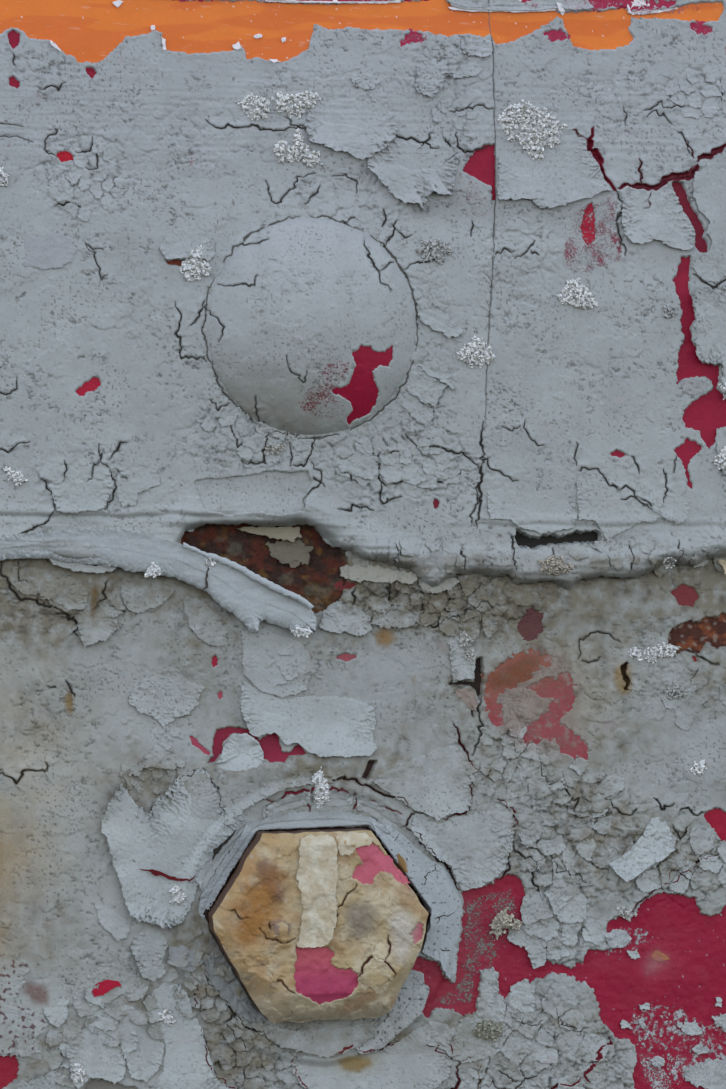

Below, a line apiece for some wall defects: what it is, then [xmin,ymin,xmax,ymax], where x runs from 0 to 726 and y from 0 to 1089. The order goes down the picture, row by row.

crack [0,123,99,170]
crack [573,101,726,257]
crack [175,0,542,569]
peeling [0,0,726,577]
crack [694,274,726,289]
rust [181,523,348,614]
rust [667,613,726,654]
crack [0,763,48,784]
peeling [0,528,726,1089]
crack [265,700,590,951]
crack [536,748,704,840]
crack [356,935,396,980]